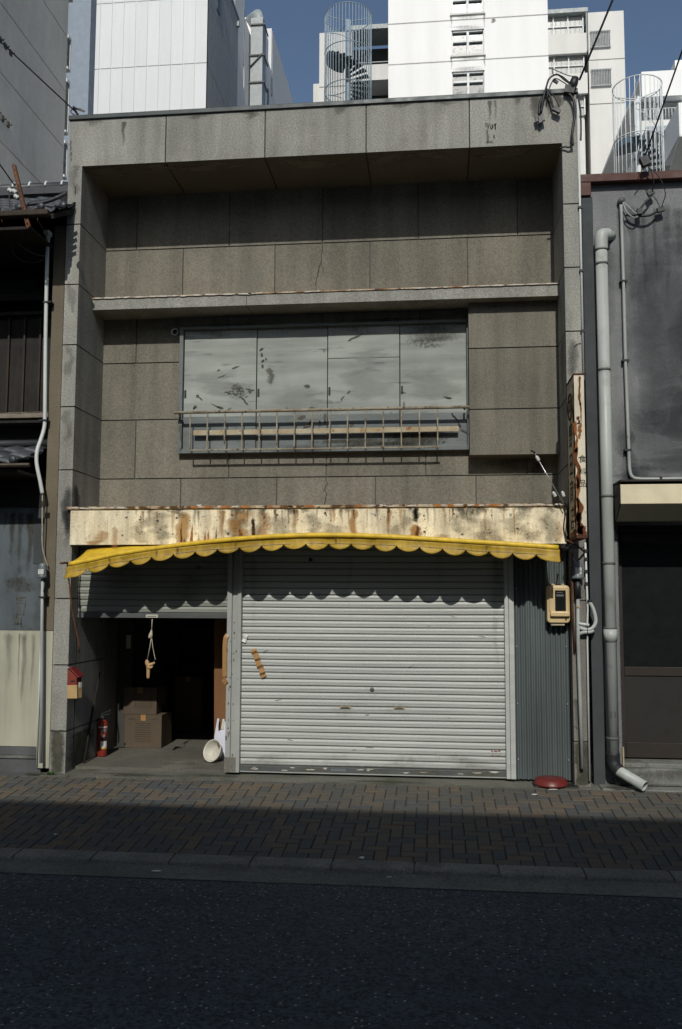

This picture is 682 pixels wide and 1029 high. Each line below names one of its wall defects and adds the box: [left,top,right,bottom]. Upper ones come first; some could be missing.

leakage [622,434,641,479]
rust [127,505,315,542]
rust [331,505,362,533]